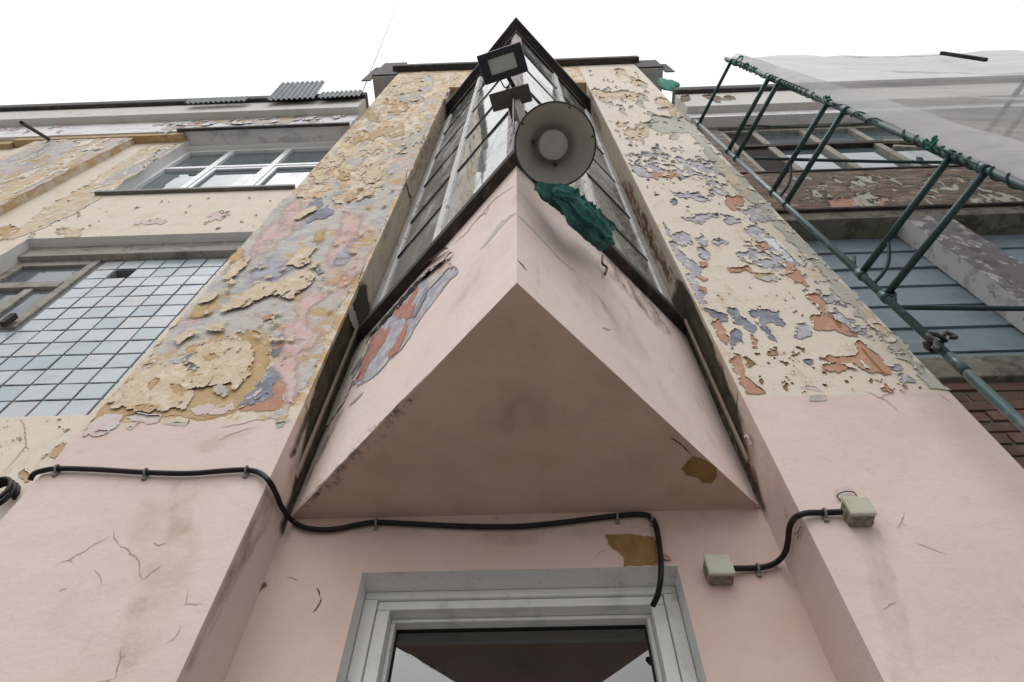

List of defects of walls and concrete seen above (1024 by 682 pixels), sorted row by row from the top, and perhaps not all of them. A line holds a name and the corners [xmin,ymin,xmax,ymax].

peeling [780,174,1023,207]
peeling [0,71,459,436]
peeling [588,67,950,394]
peeling [681,456,717,484]
crack [62,530,165,583]
peeling [605,534,672,566]